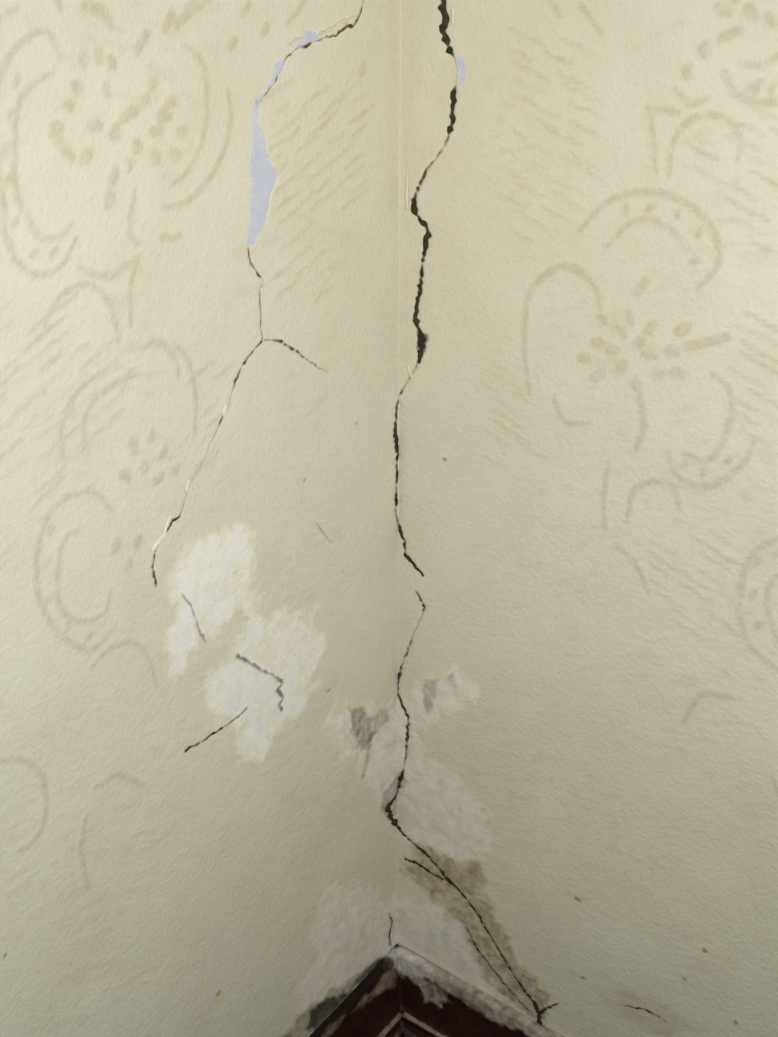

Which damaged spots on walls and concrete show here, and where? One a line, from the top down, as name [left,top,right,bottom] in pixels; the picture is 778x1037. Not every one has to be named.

peeling [247,30,320,246]
crack [257,0,365,108]
crack [150,247,330,588]
crack [385,0,558,1026]
crack [185,707,248,752]
flaking render [209,625,311,746]